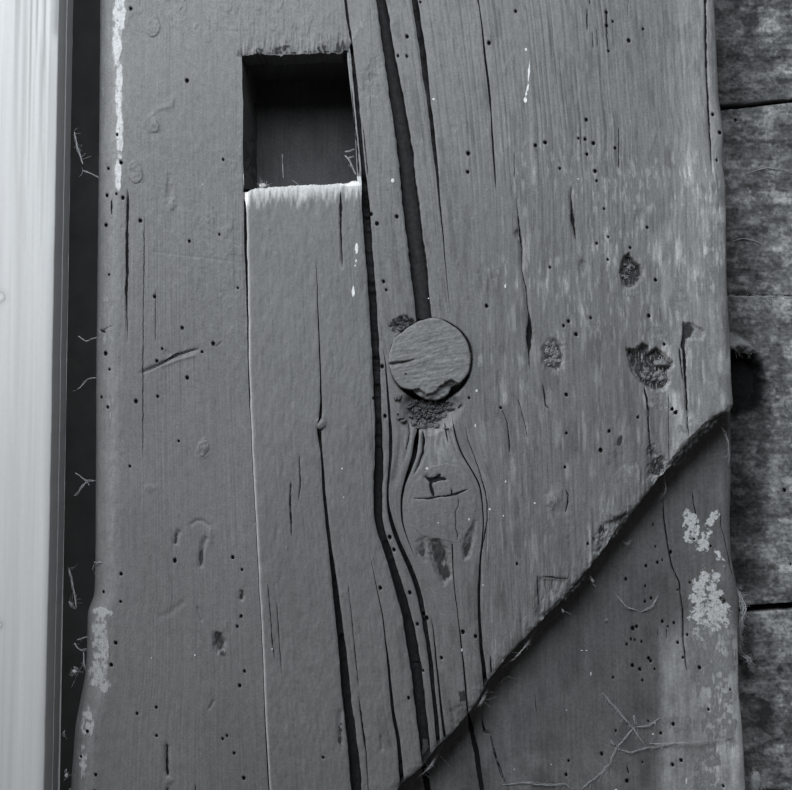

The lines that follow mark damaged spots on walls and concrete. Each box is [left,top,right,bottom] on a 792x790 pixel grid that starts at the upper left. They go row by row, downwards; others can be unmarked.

crack [477,0,515,187]
crack [100,195,197,459]
crack [337,192,345,267]
crack [344,0,508,790]
crack [503,400,527,452]
crack [516,201,532,364]